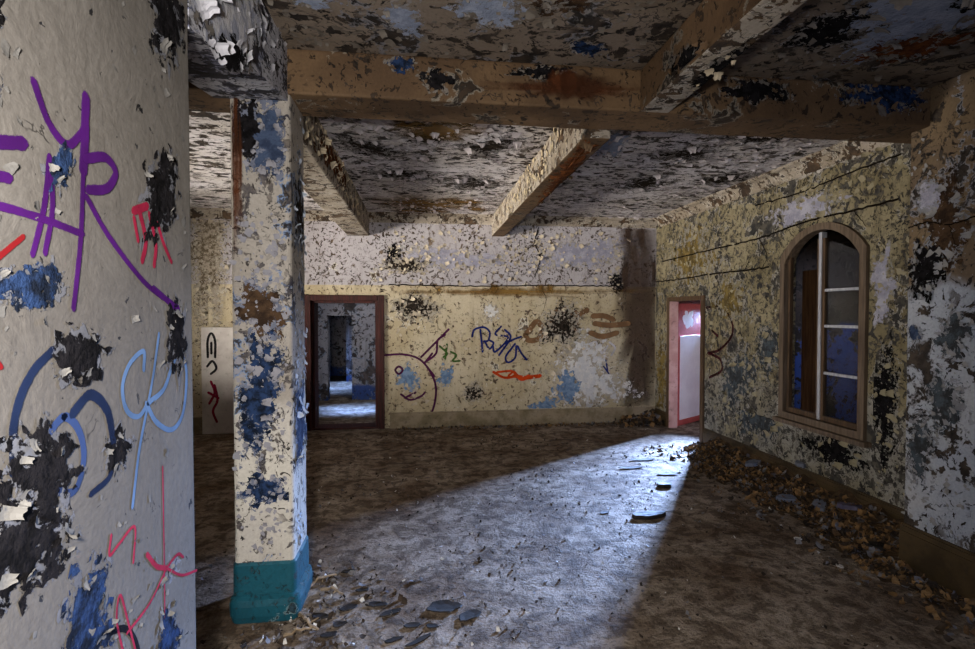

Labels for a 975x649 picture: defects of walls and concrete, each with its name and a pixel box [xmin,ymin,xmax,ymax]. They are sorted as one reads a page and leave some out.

peeling [0,0,20,60]
peeling [132,0,609,108]
peeling [668,38,708,77]
peeling [3,162,19,175]
flaking render [138,98,832,556]
peeling [667,138,975,518]
peeling [0,411,188,649]